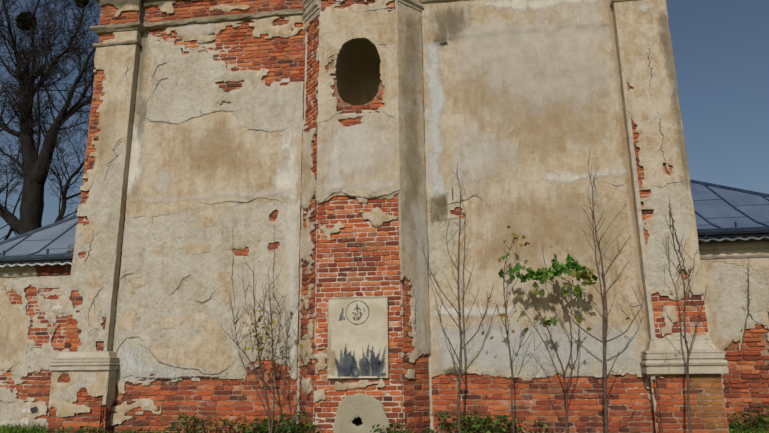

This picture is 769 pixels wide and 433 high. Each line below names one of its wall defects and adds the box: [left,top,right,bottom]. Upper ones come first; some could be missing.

spalling [82,70,106,186]
crack [140,62,282,137]
peeling [98,0,385,181]
crack [647,40,696,308]
crack [115,335,240,387]
crack [164,195,285,335]
peeling [0,119,769,433]
crack [738,258,769,362]